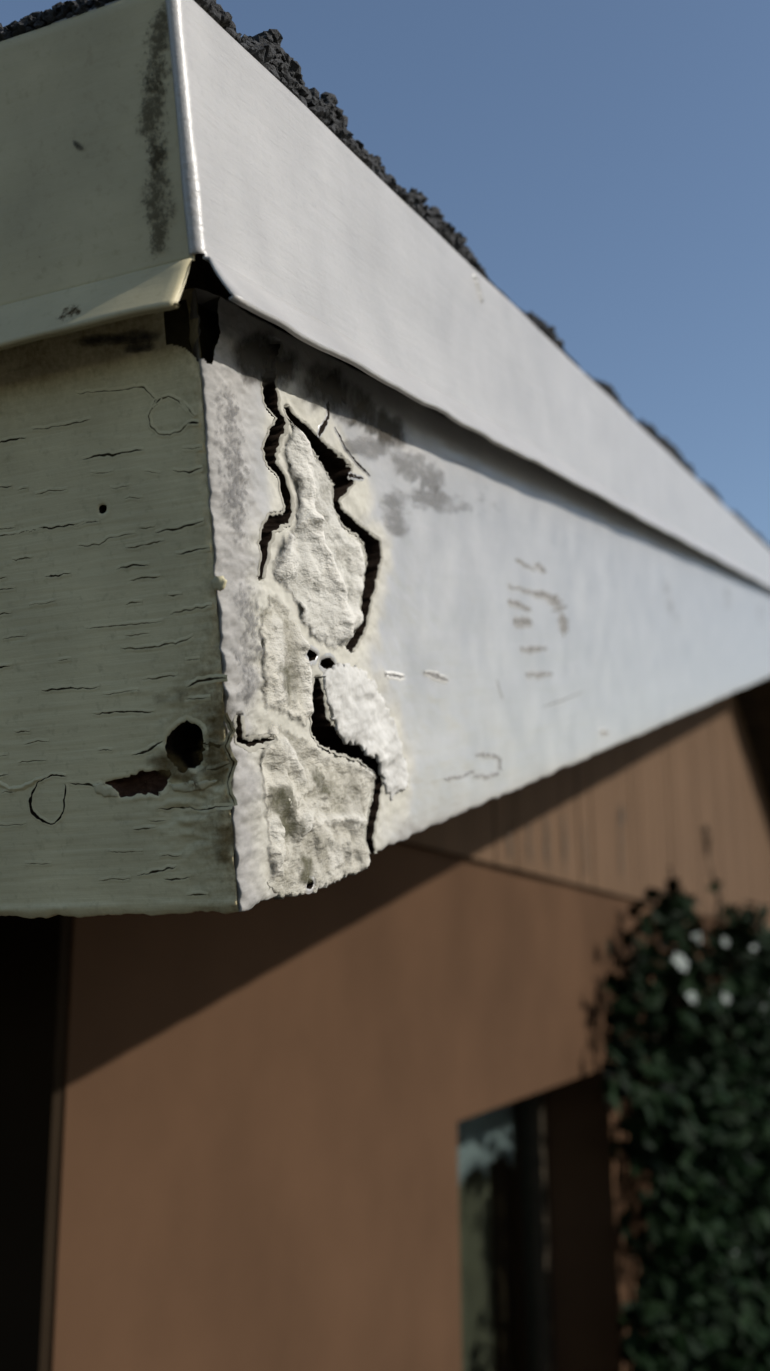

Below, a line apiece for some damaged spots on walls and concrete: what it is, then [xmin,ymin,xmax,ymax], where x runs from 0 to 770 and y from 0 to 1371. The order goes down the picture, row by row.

leakage [138,4,174,254]
crack [257,344,384,651]
crack [0,383,278,899]
spalling [93,765,218,803]
peeling [211,576,227,591]
crack [309,678,384,854]
peeling [305,645,409,801]
peeling [423,670,449,684]
spalling [304,877,315,894]